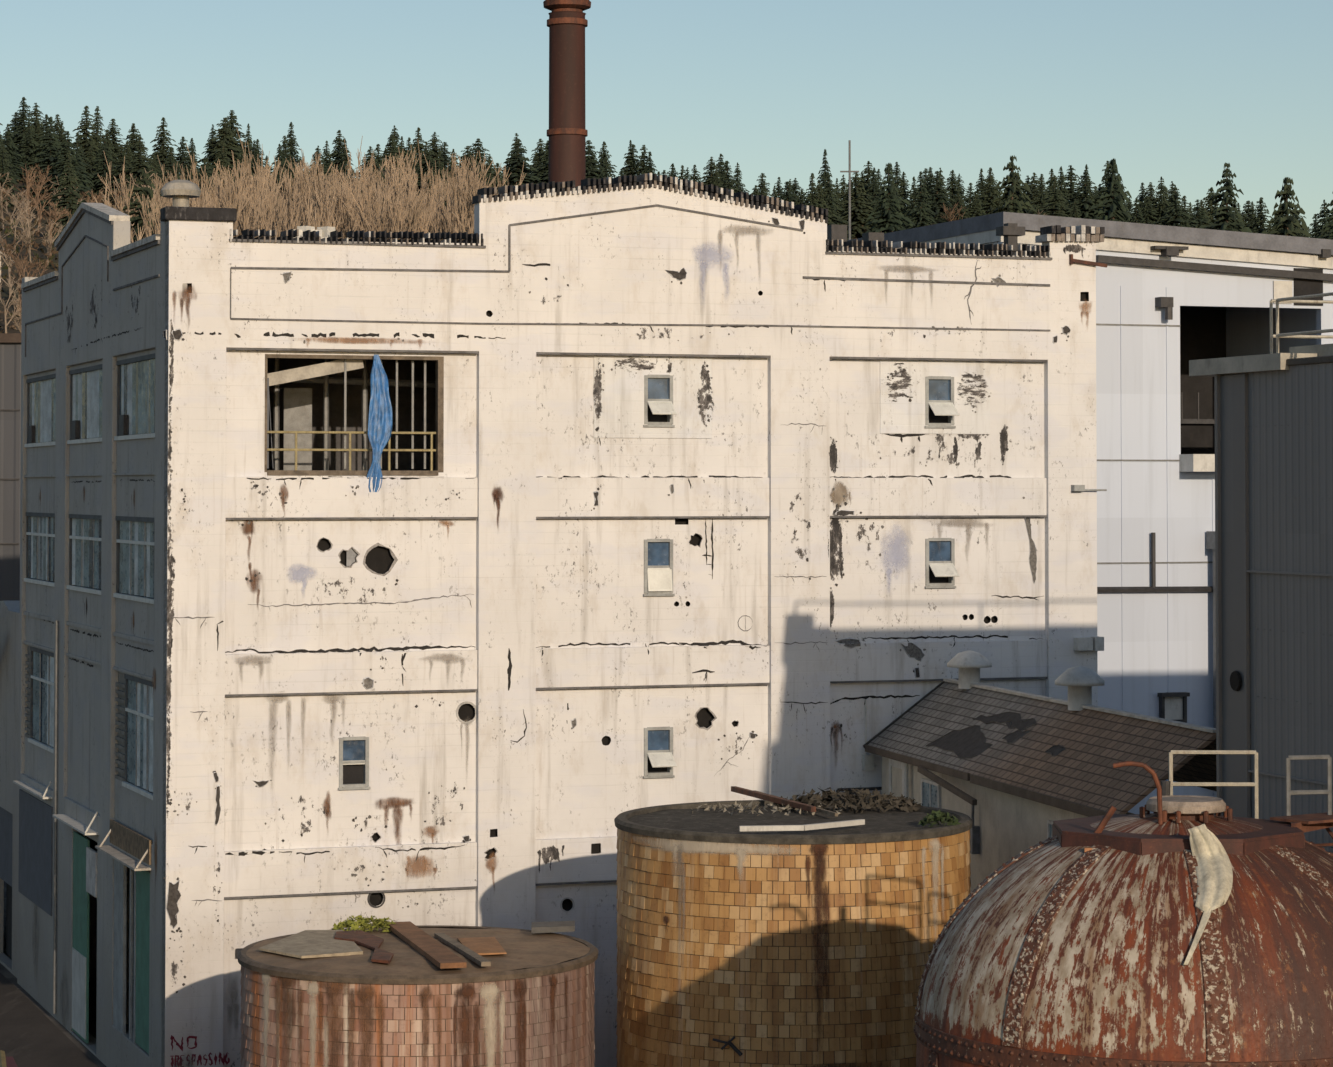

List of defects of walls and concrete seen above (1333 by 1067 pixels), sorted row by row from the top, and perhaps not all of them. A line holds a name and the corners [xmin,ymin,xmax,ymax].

damp [700,228,759,270]
peeling [697,361,714,427]
peeling [881,363,913,402]
peeling [957,368,990,413]
spalling [316,537,399,605]
crack [173,594,474,684]
crack [863,635,1042,647]
crack [507,615,827,743]
corrosion [379,798,412,837]
corrosion [408,857,437,875]
efflorescence [307,981,329,1067]
efflorescence [481,985,505,1067]